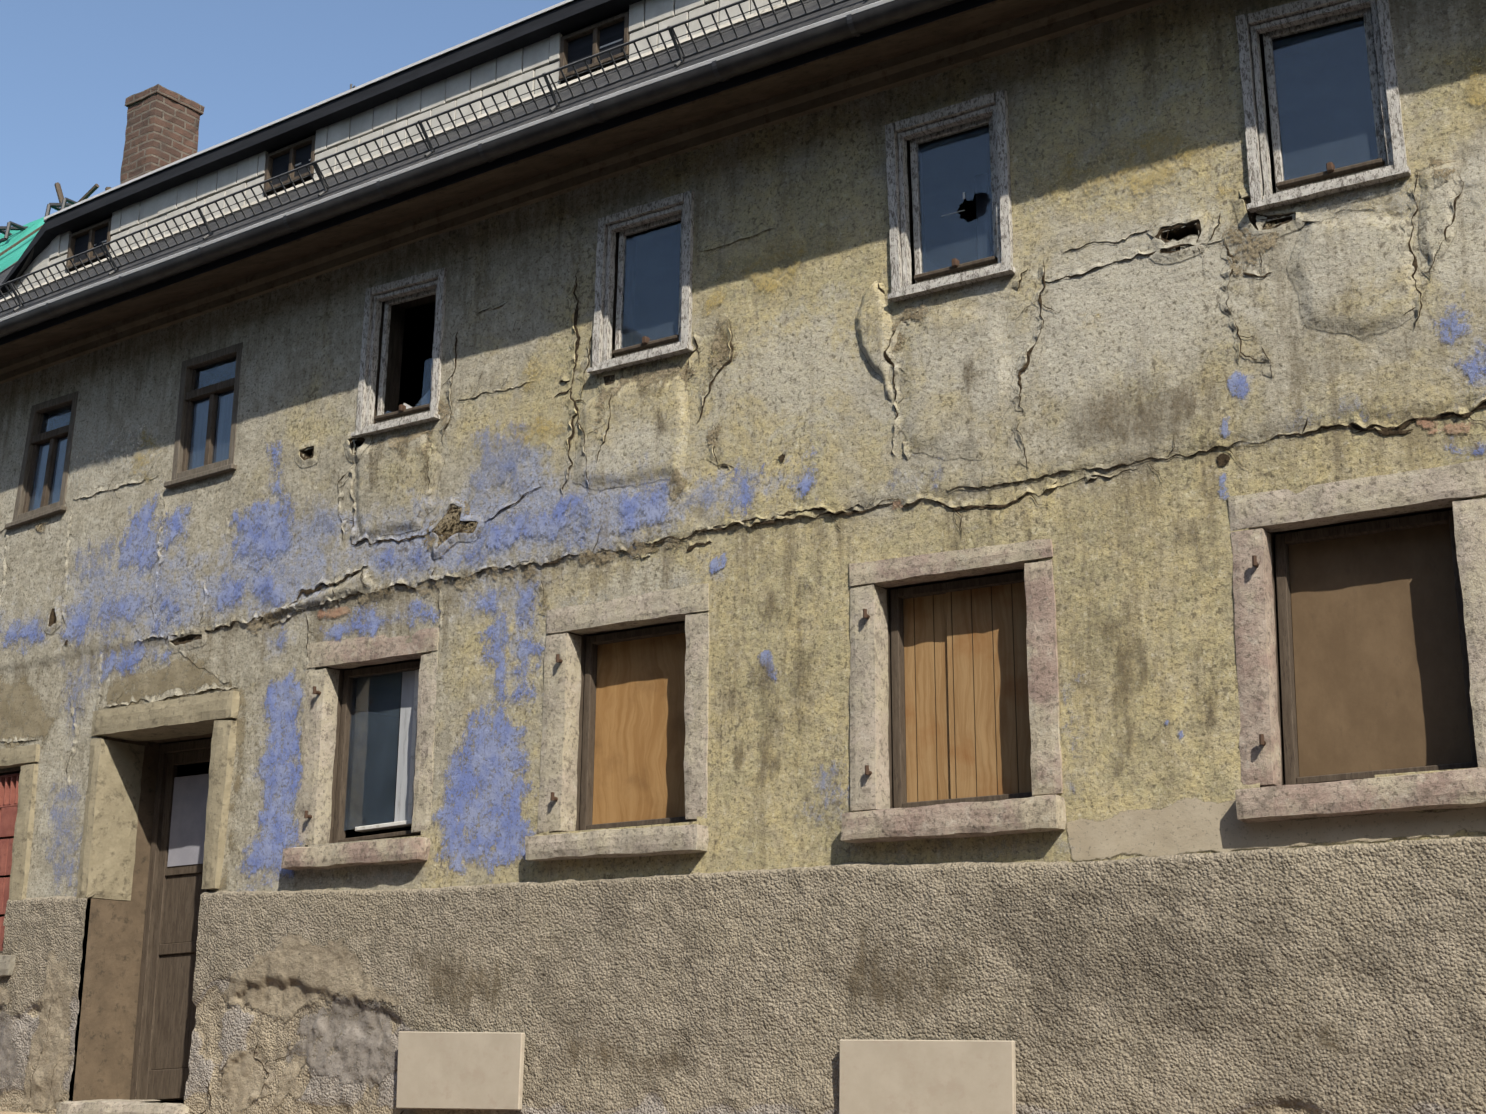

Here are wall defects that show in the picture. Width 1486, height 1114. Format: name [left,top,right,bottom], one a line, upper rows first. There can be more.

crack [0,164,1486,798]
flaking render [1417,417,1485,458]